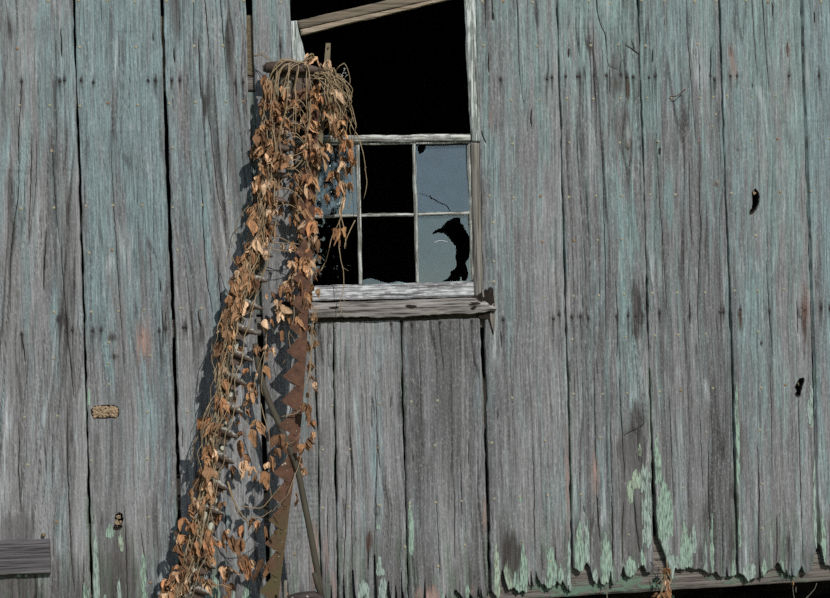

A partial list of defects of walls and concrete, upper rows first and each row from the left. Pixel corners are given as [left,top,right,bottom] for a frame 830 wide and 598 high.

crack [593,0,653,112]
crack [596,142,618,351]
crack [583,380,645,564]
peeling [627,469,641,504]
peeling [654,434,693,569]
peeling [105,524,124,552]
peeling [140,553,148,598]
peeling [494,540,529,598]
peeling [600,531,646,585]
peeling [731,517,742,576]